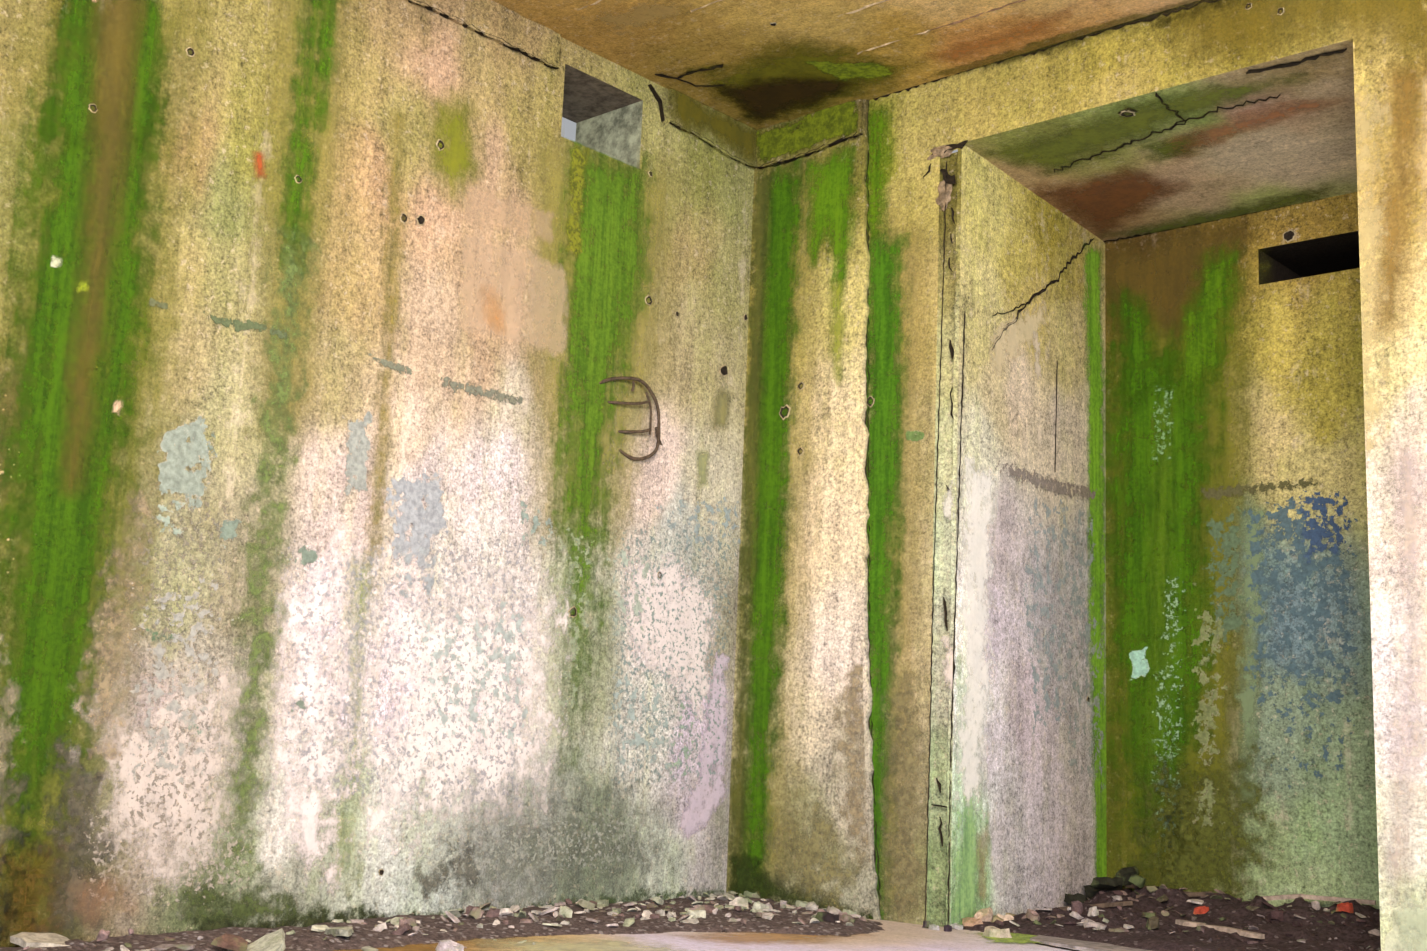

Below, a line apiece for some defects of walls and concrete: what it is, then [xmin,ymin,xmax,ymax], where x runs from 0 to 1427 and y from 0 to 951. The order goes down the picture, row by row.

leakage [0,0,164,940]
leakage [415,109,929,923]
crack [924,162,1271,924]
leakage [1105,220,1275,898]